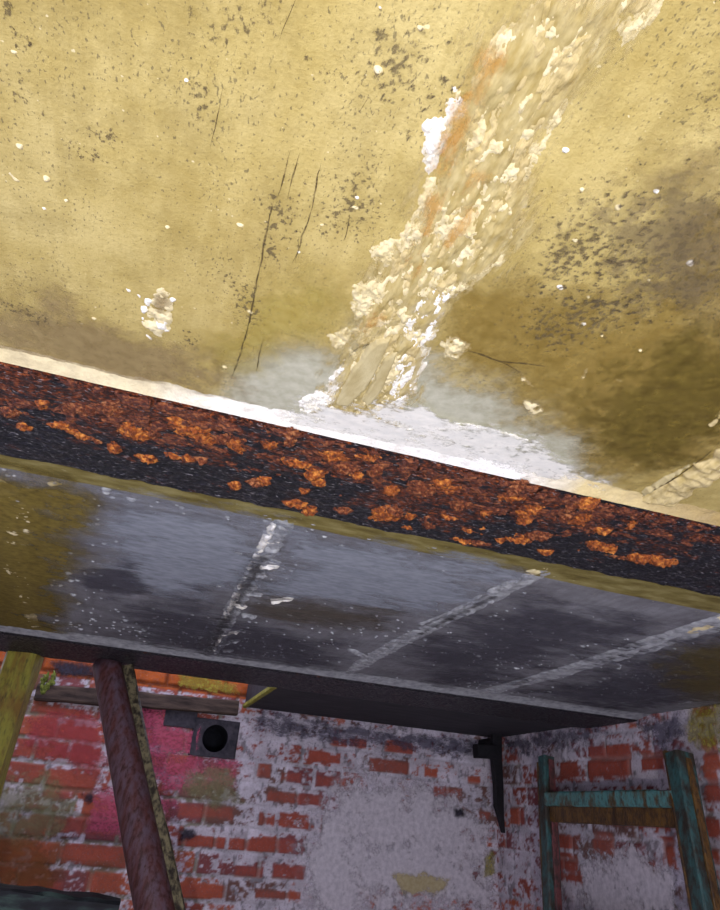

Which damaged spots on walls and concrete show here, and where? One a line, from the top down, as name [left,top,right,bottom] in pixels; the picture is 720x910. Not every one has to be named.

damp [356,29,429,101]
peeling [126,288,176,340]
crack [232,153,320,376]
damp [317,165,379,239]
damp [207,177,720,486]
crack [468,350,545,373]
rust [0,364,720,559]
damp [0,469,720,709]
peeling [296,768,493,910]
peeling [577,842,679,910]